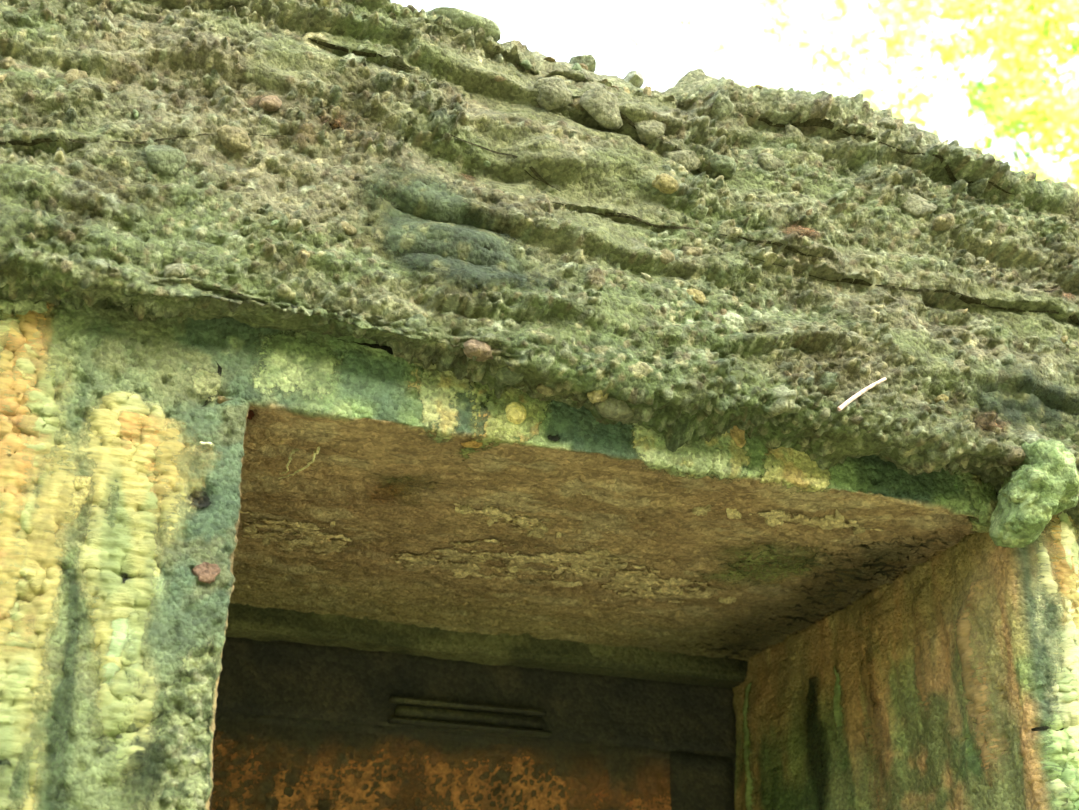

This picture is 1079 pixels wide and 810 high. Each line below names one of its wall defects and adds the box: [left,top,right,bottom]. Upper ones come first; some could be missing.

crack [744,114,1012,194]
crack [439,131,1079,325]
water stain [717,543,927,655]
water stain [49,568,81,810]
water stain [103,617,134,685]
water stain [125,739,165,802]
corrosion [209,738,611,810]
corrosion [624,783,671,810]
water stain [804,665,843,810]
efflorescence [1041,716,1079,810]